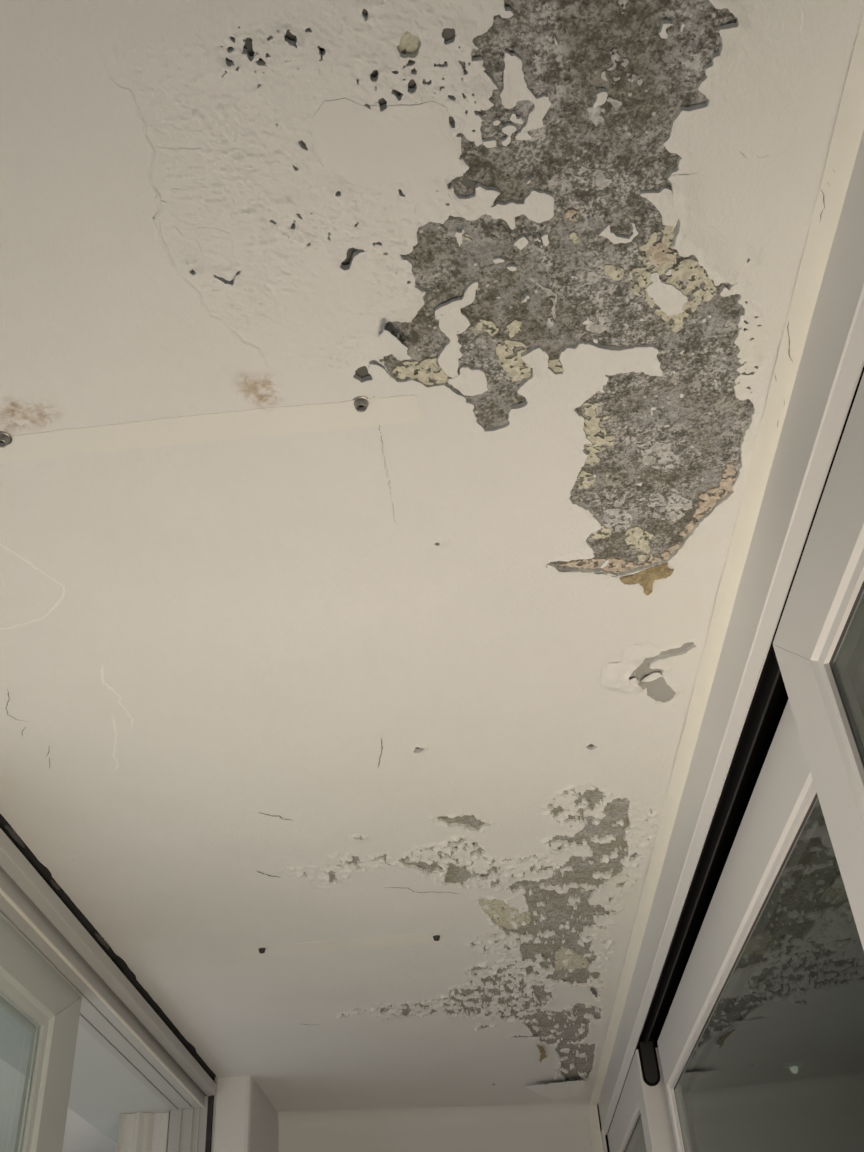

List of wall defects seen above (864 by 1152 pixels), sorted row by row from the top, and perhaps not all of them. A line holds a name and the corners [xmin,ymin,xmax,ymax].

crack [100,44,285,377]
spalling [368,0,754,595]
peeling [634,642,694,702]
spalling [381,787,637,1103]